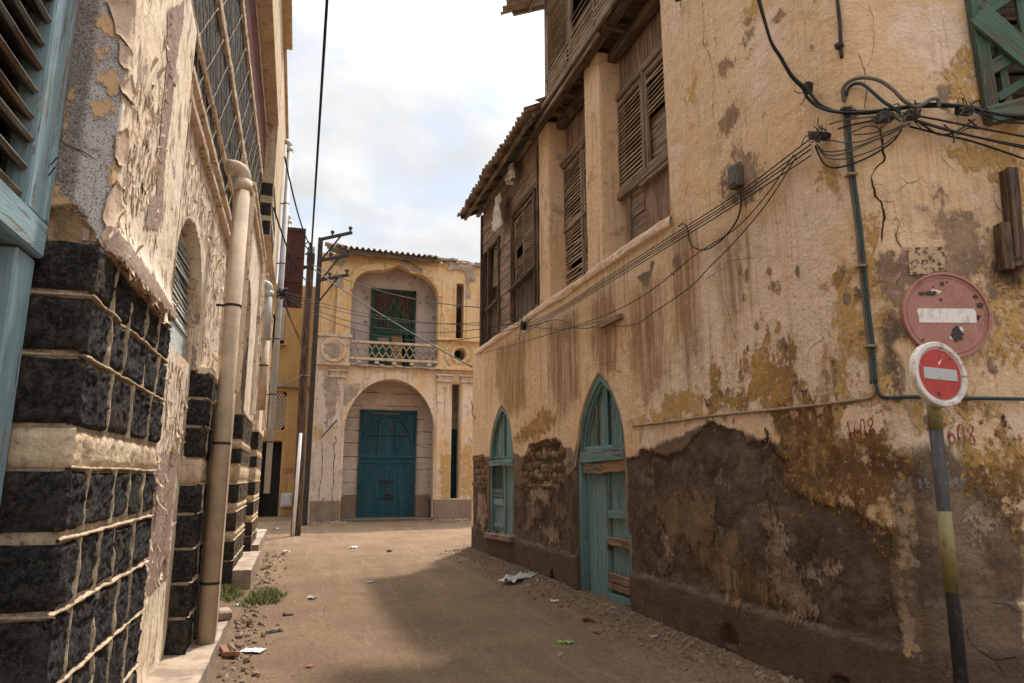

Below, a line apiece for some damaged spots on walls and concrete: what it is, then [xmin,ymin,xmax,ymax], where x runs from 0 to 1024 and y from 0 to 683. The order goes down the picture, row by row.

peeling [47,0,185,324]
crack [859,4,922,257]
peeling [922,38,980,107]
peeling [144,359,190,605]
flaking render [514,406,578,557]
water stain [633,286,660,389]
flaking render [627,209,929,652]
peeling [937,389,1024,485]